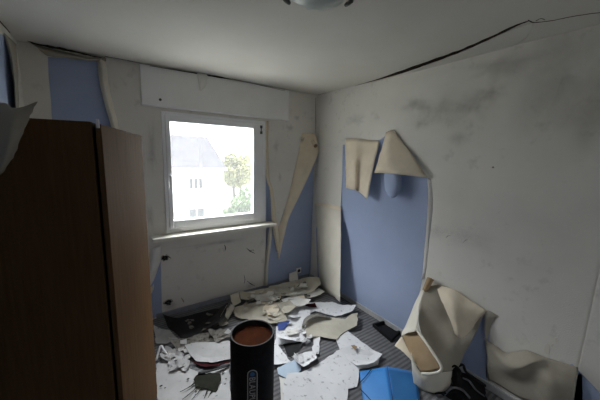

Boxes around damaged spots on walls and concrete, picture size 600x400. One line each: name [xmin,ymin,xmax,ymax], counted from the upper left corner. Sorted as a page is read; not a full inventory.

peeling [0,34,15,108]
peeling [48,57,111,127]
crack [359,12,600,85]
peeling [265,165,319,284]
peeling [340,136,428,330]
peeling [461,315,490,381]